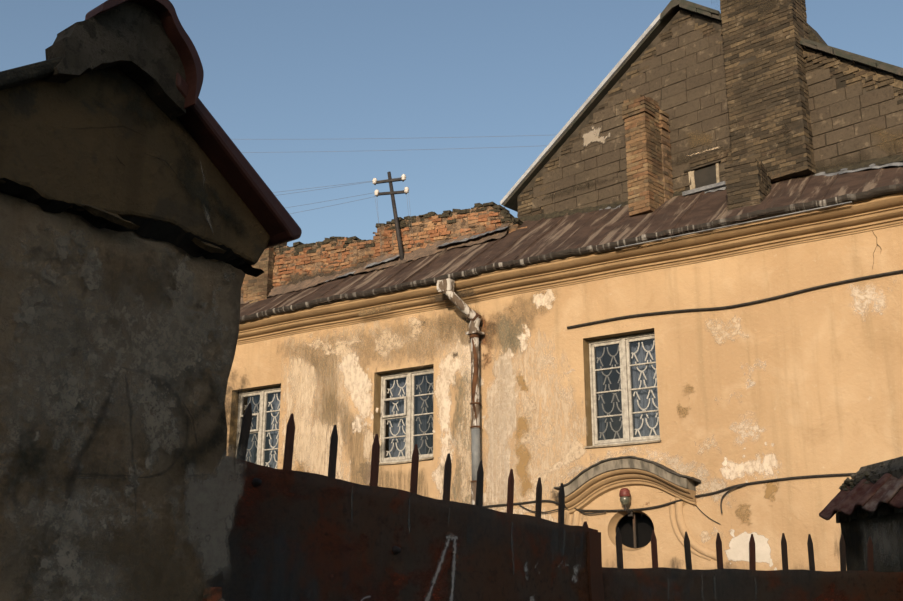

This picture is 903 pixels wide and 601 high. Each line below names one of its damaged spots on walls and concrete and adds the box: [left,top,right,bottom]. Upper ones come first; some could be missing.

flaking render [583,126,610,146]
crack [0,178,264,277]
water stain [429,288,474,302]
flaking render [533,289,555,309]
flaking render [850,285,885,315]
water stain [290,294,545,516]
flaking render [172,445,246,576]
flaking render [645,420,779,598]